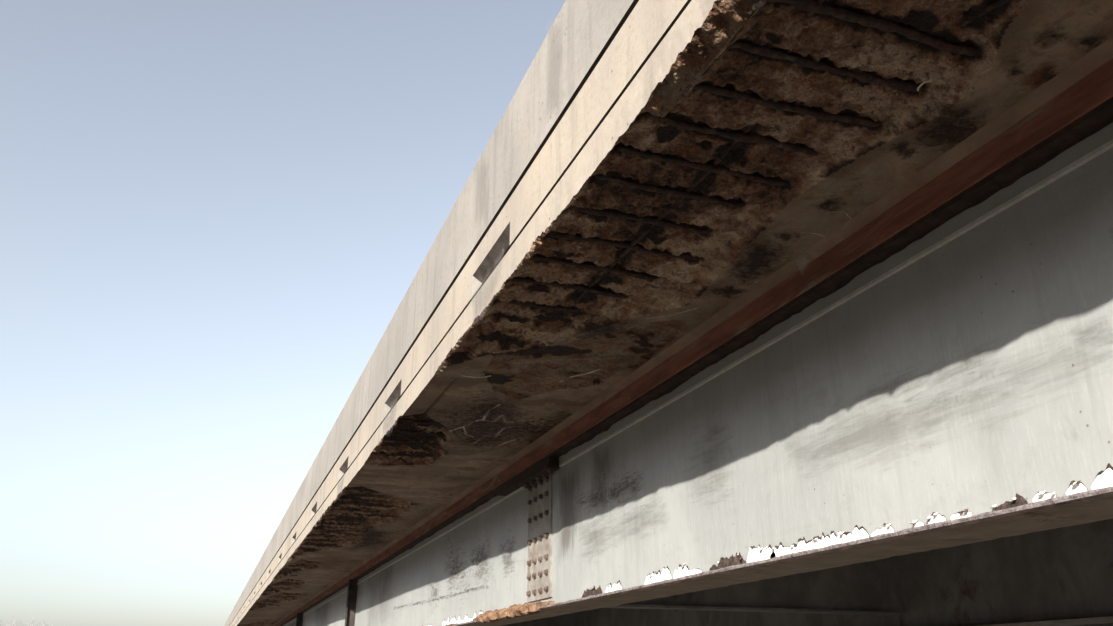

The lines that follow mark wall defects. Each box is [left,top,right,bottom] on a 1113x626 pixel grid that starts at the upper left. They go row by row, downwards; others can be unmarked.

spalling [441,0,1022,399]
spalling [365,412,453,466]
crack [442,404,521,463]
peeling [991,463,1113,510]
peeling [910,509,973,527]
spalling [237,486,418,626]